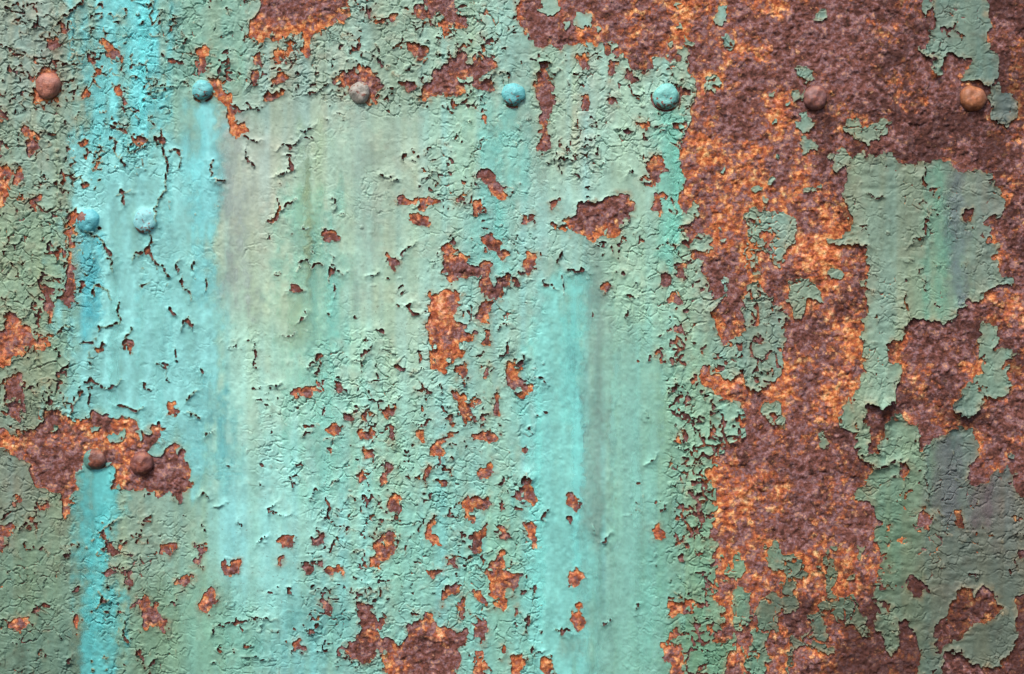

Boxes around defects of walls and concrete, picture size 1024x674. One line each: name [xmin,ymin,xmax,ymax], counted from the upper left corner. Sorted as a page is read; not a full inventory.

corrosion [246,0,351,108]
corrosion [0,208,194,520]
crack [307,328,385,402]
crack [405,303,420,316]
crack [413,367,442,427]
corrosion [415,232,540,487]
crack [497,323,546,383]
corrosion [511,0,1024,674]
peeling [731,151,1024,674]
crack [289,476,338,519]
crack [308,620,328,652]
corrosion [336,495,557,674]